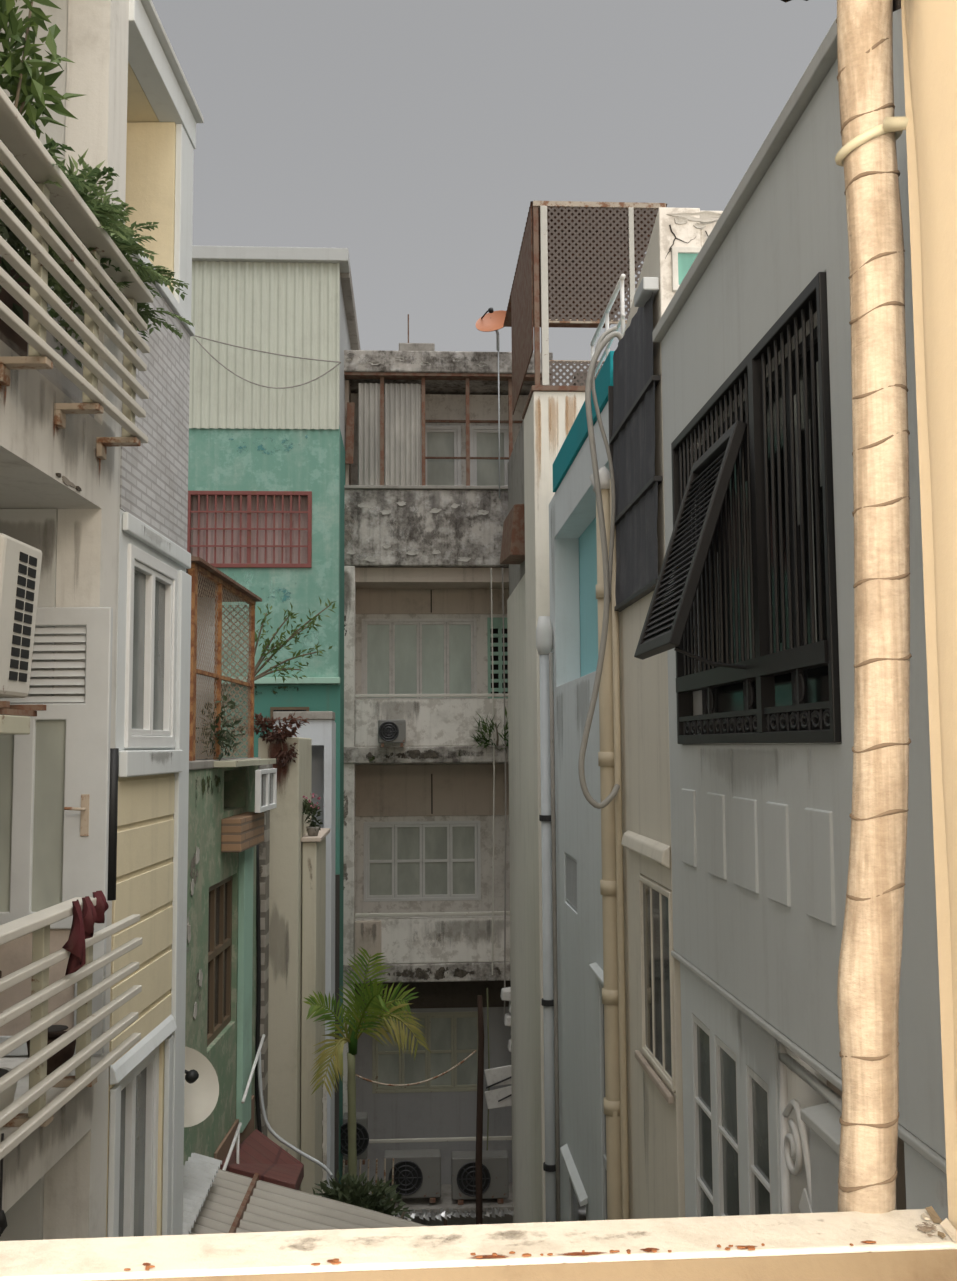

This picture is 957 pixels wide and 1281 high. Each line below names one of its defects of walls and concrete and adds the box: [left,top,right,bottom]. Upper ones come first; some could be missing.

water stain [390,513,470,545]